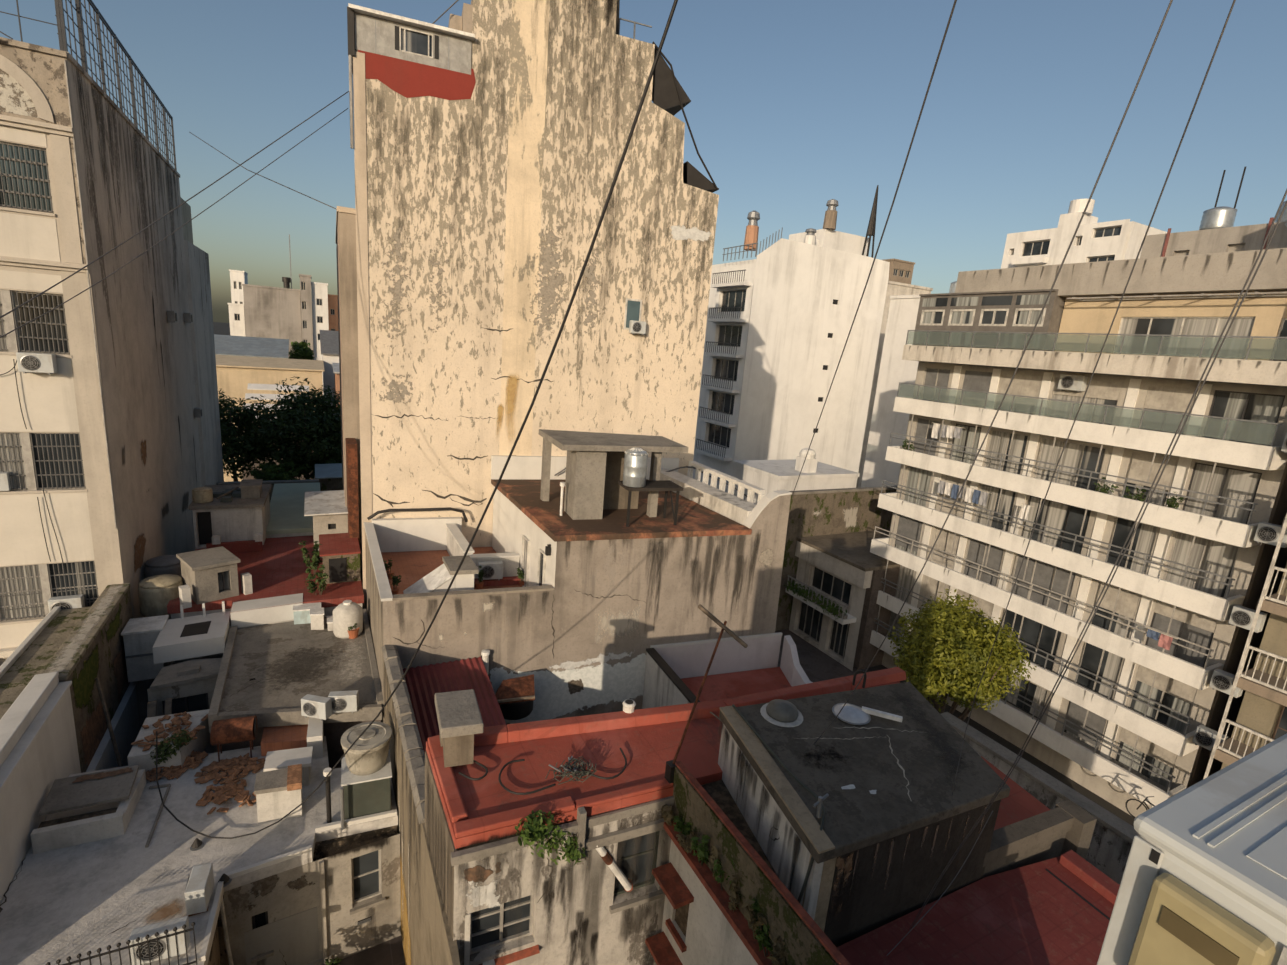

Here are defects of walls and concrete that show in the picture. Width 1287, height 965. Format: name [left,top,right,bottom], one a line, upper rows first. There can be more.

crack [371,413,498,421]
leakage [498,377,518,423]
crack [492,375,553,383]
crack [448,453,516,461]
crack [373,490,487,507]
leakage [653,533,759,597]
leakage [597,611,638,640]
leakage [327,685,446,965]
leakage [459,817,666,938]
leakage [569,912,598,965]